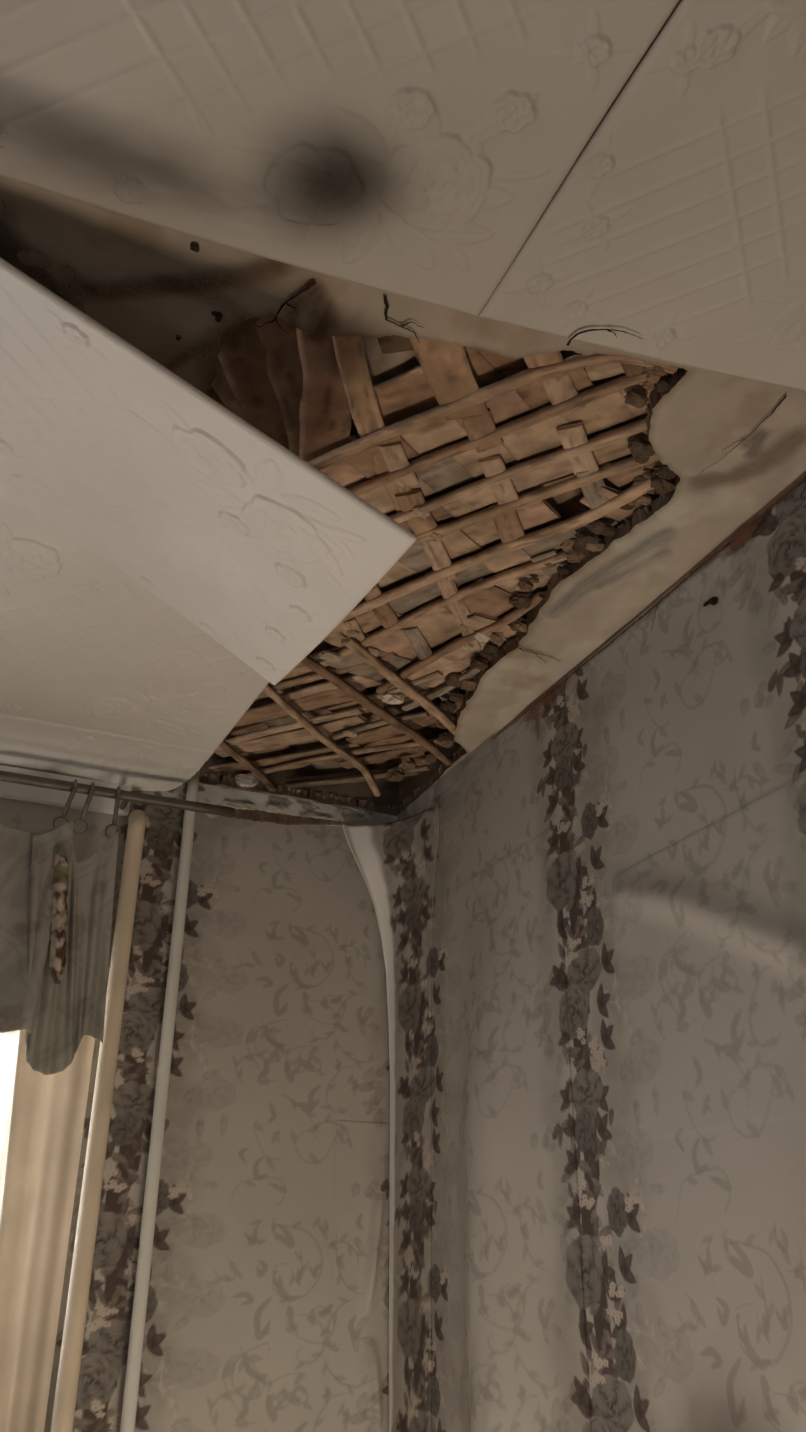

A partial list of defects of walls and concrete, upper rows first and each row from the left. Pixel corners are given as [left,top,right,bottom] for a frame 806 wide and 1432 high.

crack [383,296,424,342]
crack [566,329,643,346]
peeling [407,787,434,816]